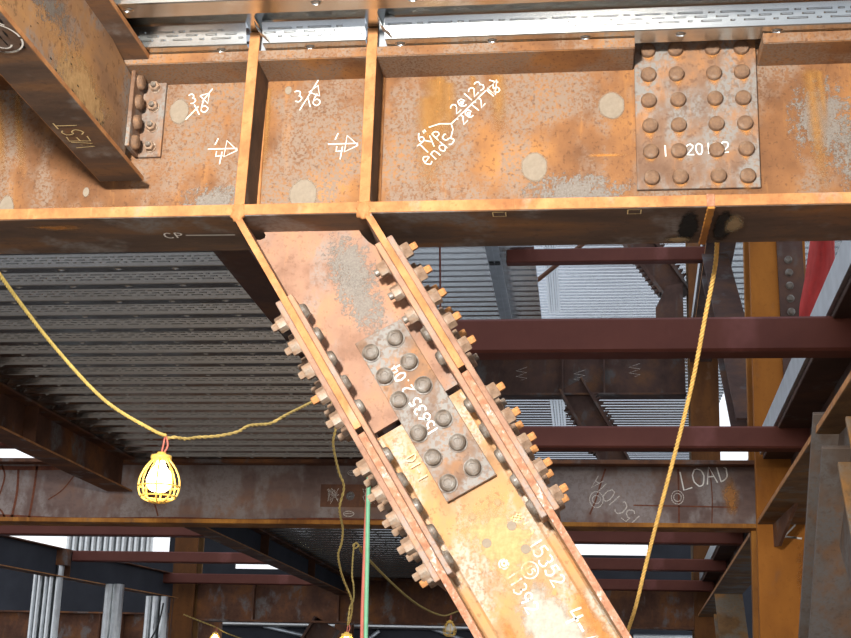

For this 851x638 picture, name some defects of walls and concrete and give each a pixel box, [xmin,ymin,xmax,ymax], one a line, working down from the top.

corrosion [56,53,104,125]
corrosion [0,465,60,517]
corrosion [59,466,224,519]
corrosion [634,469,738,523]
corrosion [470,513,533,583]
corrosion [581,597,610,638]